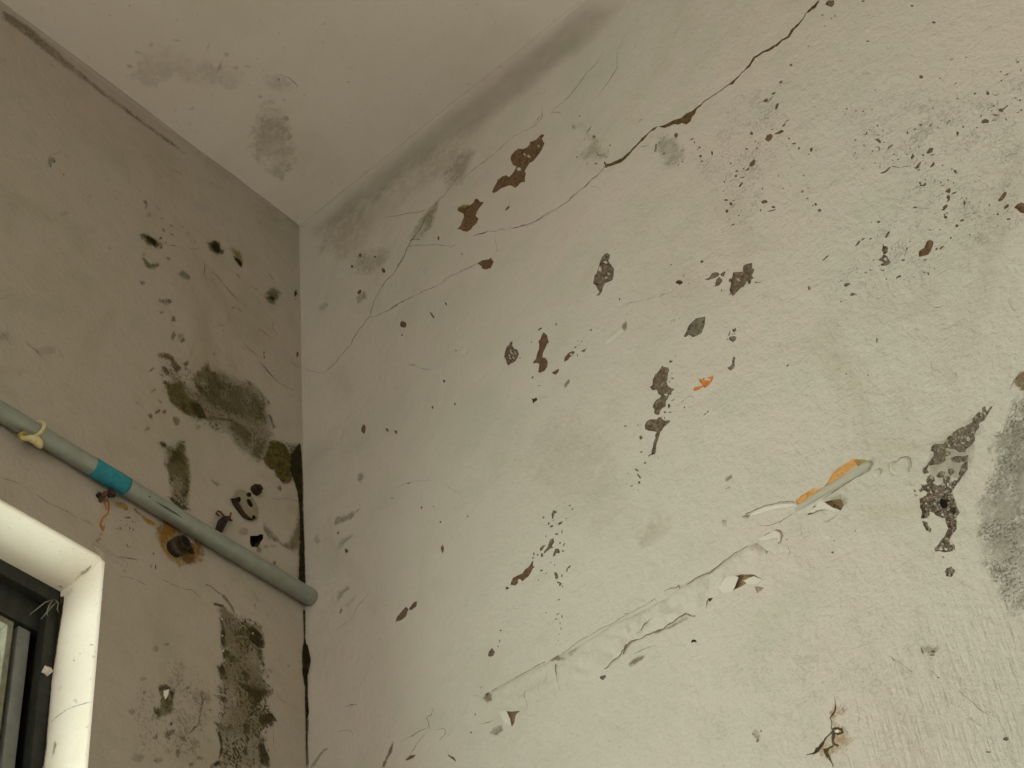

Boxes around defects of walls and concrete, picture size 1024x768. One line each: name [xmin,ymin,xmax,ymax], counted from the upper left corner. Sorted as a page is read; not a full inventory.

damp [207,241,242,266]
flaking render [492,134,544,193]
crack [223,0,820,388]
flaking render [704,263,761,296]
rust [99,499,201,569]
damp [162,441,190,510]
damp [149,354,292,458]
crack [290,443,306,583]
flaking render [630,360,694,487]
flaking render [914,406,992,577]
damp [206,584,276,768]
crack [302,610,311,766]